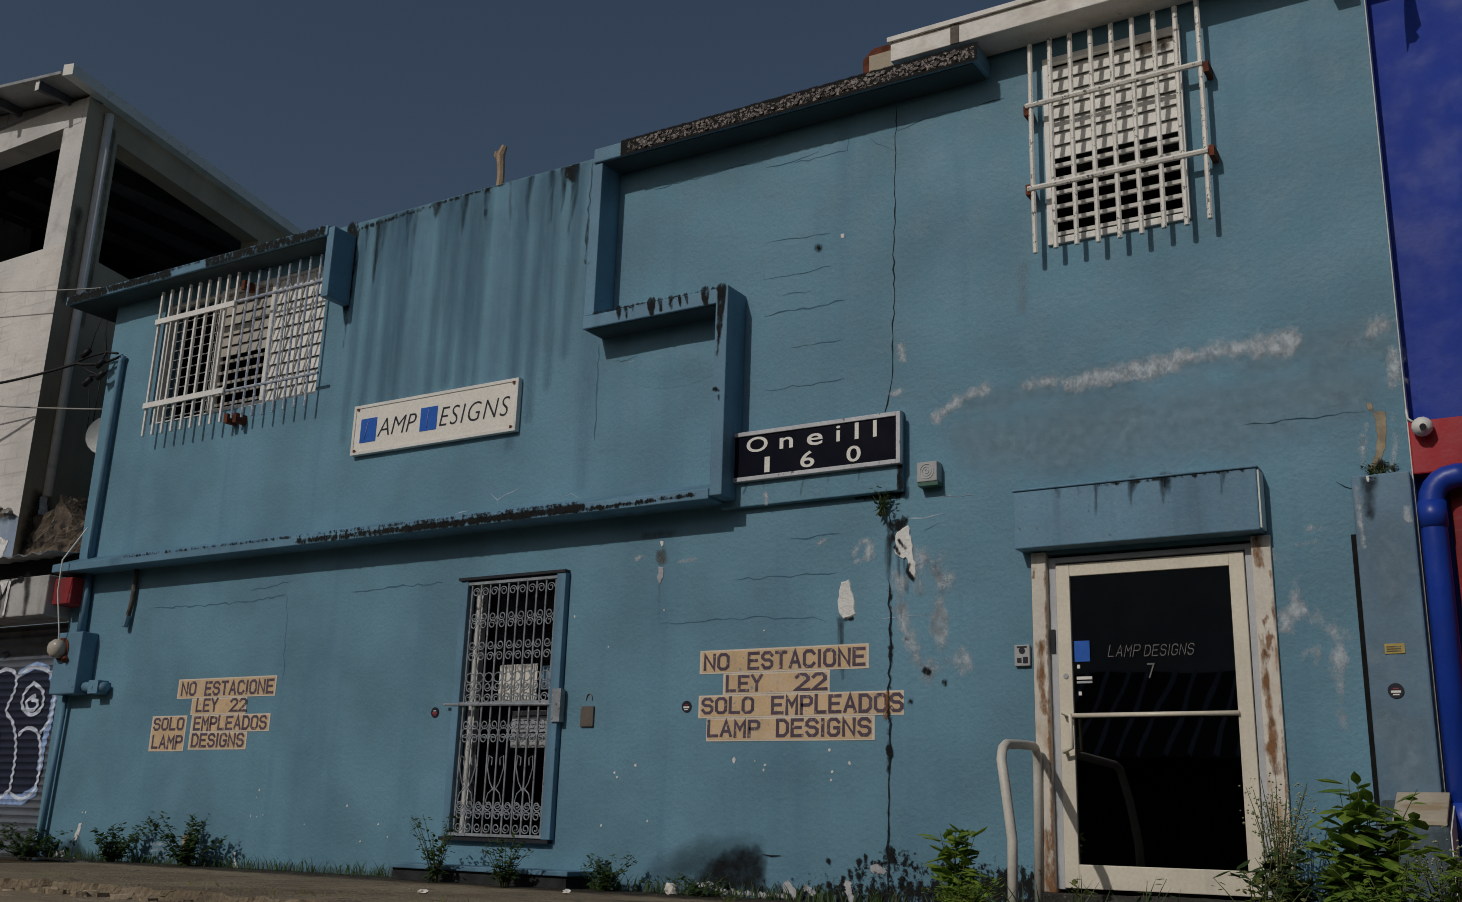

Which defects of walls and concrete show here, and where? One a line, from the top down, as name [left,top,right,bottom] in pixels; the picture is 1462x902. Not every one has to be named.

damp [343,163,593,311]
damp [594,283,726,353]
crack [658,98,1004,412]
damp [932,384,990,423]
damp [1028,330,1300,389]
peeling [838,579,856,643]
peeling [853,516,972,686]
crack [882,584,934,896]